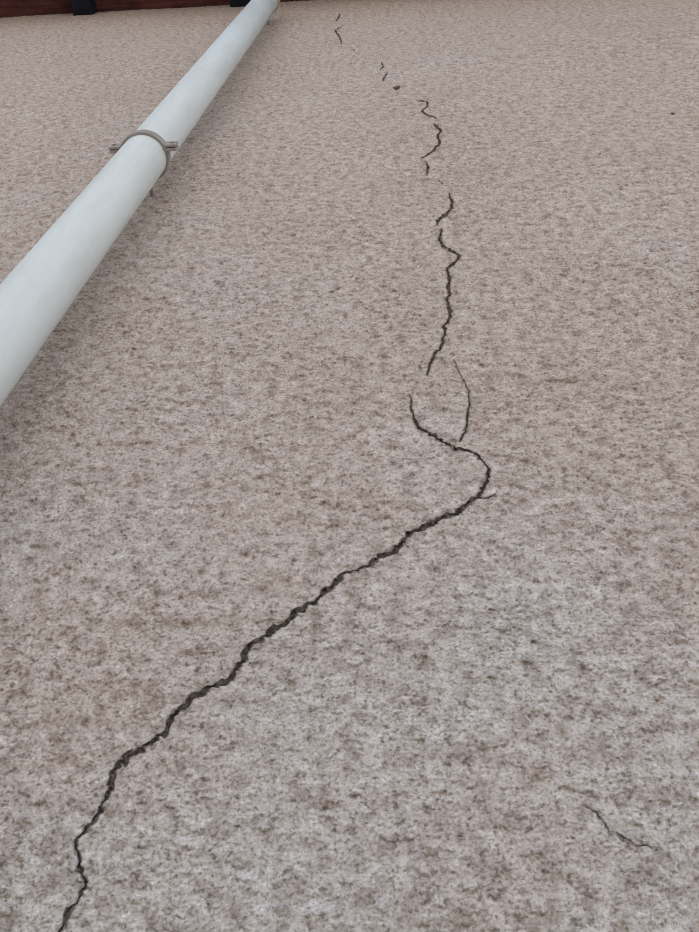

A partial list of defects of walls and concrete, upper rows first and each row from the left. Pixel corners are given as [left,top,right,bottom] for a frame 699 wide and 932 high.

crack [58,100,495,932]